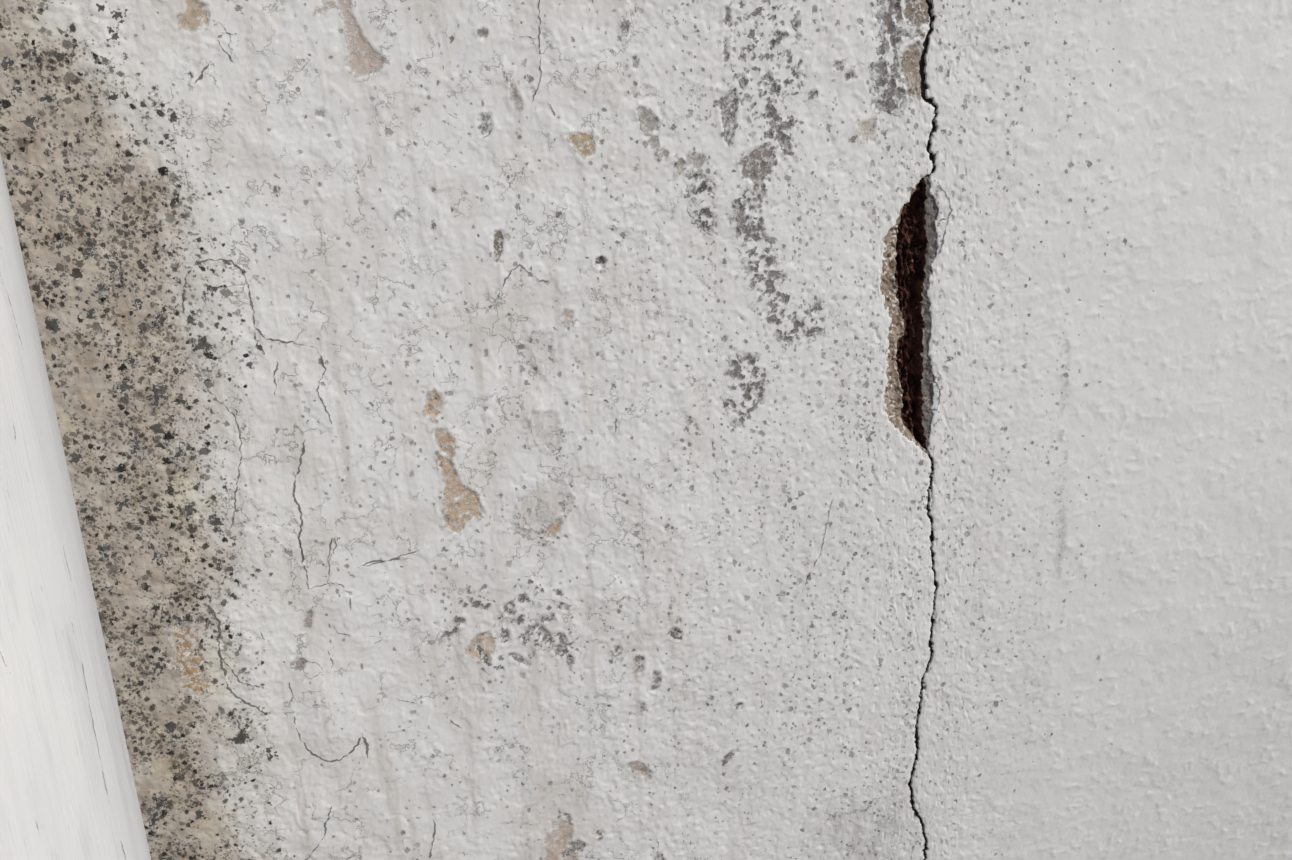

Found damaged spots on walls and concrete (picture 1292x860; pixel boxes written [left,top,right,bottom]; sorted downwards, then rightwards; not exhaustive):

peeling [312,0,387,77]
crack [919,0,953,253]
water stain [0,0,365,860]
peeling [423,387,487,540]
spalling [880,176,938,455]
crack [908,447,937,860]
peeling [541,814,604,860]